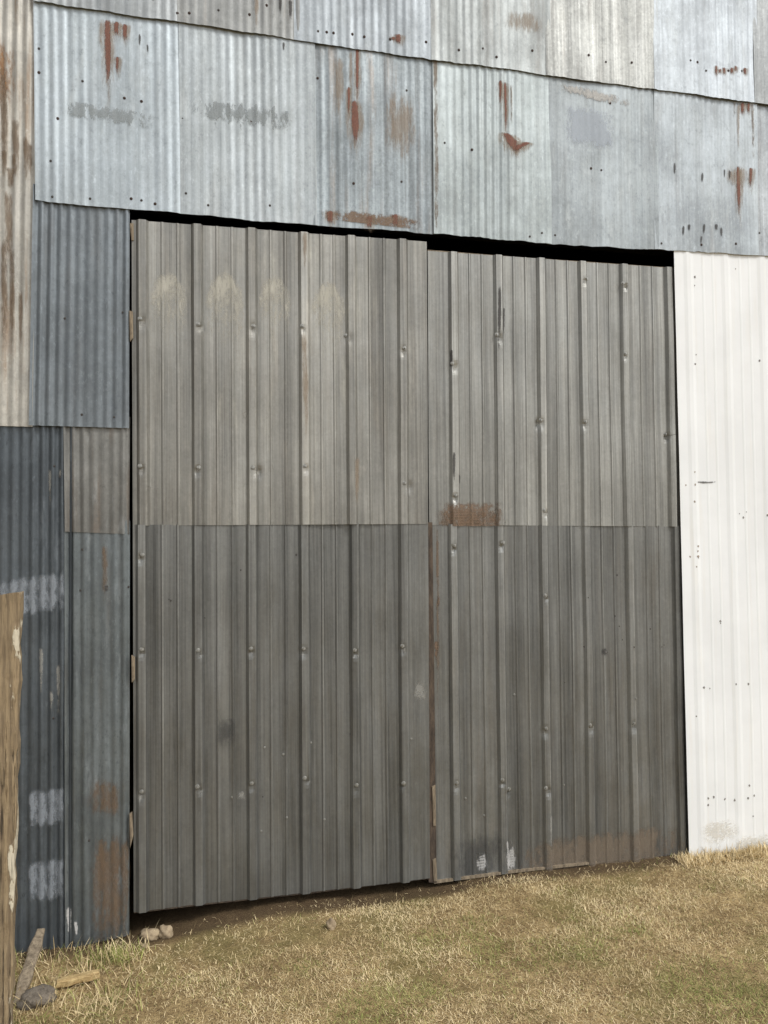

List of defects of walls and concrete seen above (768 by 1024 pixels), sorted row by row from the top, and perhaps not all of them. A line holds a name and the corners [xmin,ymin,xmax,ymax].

corrosion [104,21,127,79]
corrosion [347,49,359,140]
corrosion [499,80,529,150]
corrosion [737,167,752,208]
corrosion [327,211,417,228]
corrosion [442,504,500,526]